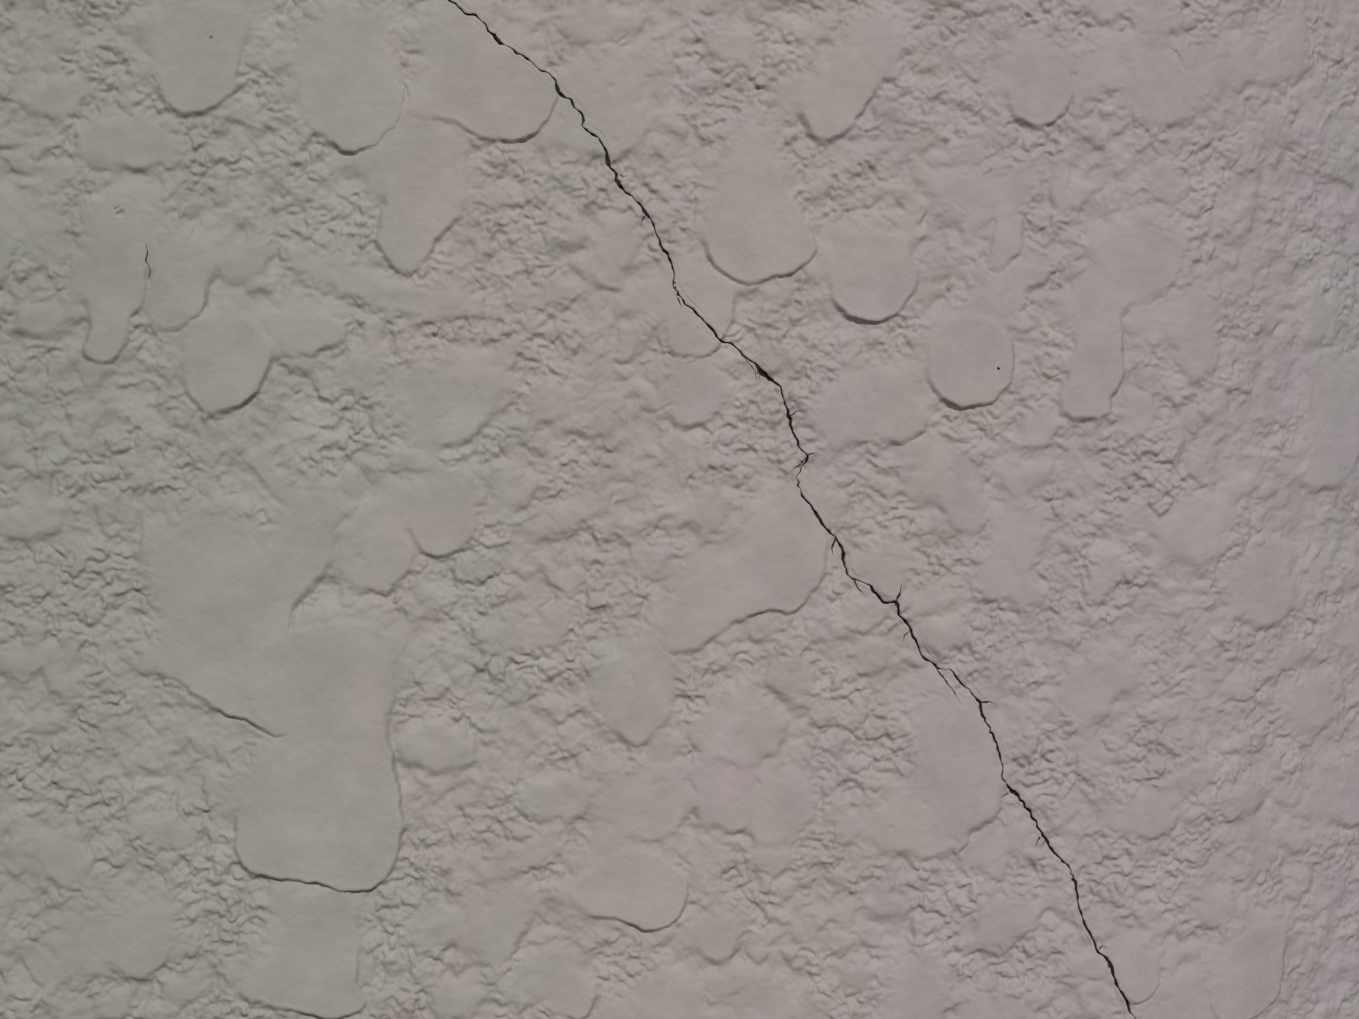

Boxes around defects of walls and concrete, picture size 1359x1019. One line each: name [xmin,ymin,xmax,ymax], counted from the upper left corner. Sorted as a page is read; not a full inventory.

crack [442,0,1140,1019]